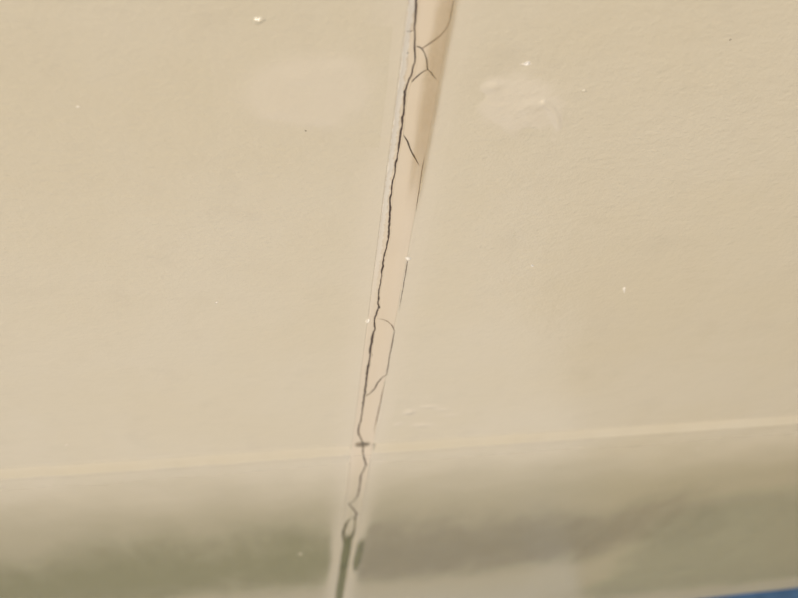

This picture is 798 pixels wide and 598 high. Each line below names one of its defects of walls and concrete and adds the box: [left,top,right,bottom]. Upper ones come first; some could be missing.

crack [342,0,454,543]